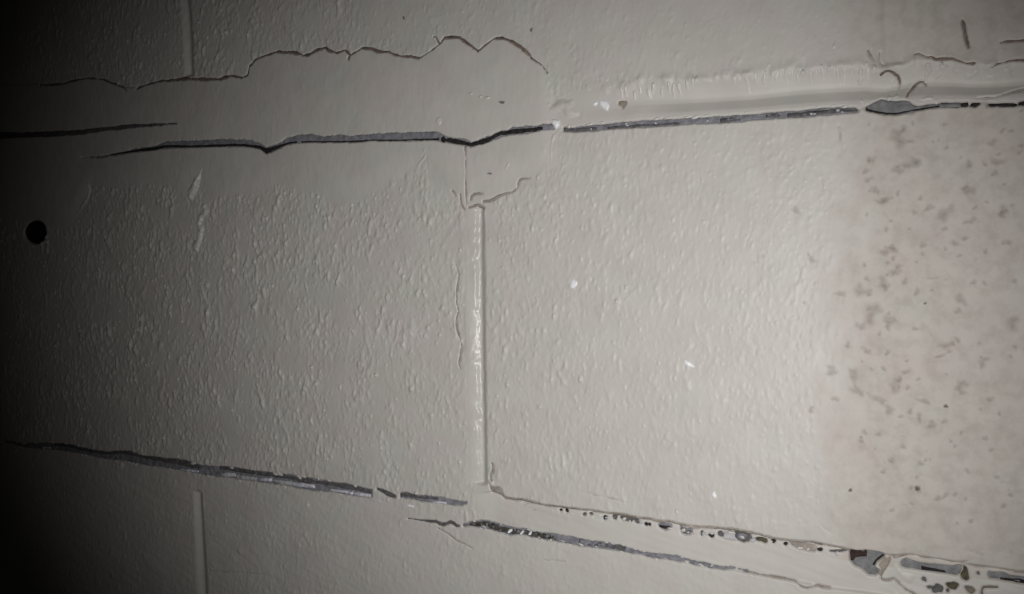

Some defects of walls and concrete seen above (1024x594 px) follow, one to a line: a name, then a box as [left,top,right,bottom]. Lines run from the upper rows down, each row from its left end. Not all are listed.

crack [0,104,859,210]
crack [5,441,851,589]
spalling [850,549,1024,594]
crack [881,554,1024,594]